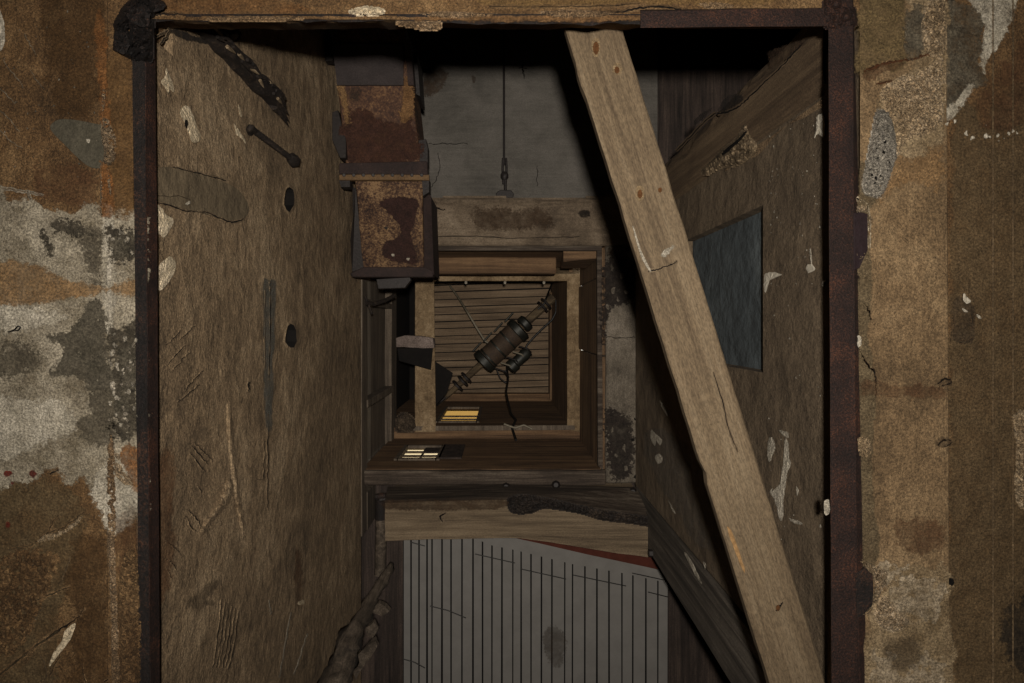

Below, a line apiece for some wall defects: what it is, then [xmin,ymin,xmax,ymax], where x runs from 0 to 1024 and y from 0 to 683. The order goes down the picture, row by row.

water stain [0,89,138,683]
peeling [180,105,201,143]
corrosion [339,108,424,163]
corrosion [379,197,419,265]
flaking render [853,0,947,633]
water stain [854,0,1024,683]